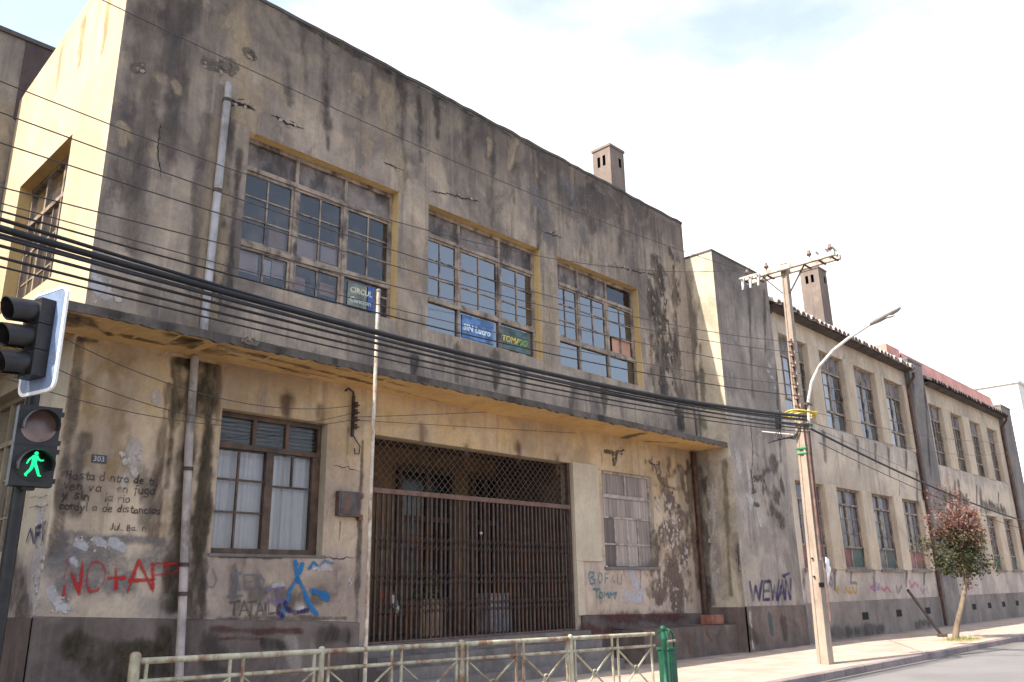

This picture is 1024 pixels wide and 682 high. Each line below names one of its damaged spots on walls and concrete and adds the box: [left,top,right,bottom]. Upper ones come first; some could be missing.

spalling [201,47,257,76]
water stain [228,38,250,141]
crack [231,99,304,129]
crack [154,122,162,176]
crack [432,190,479,202]
water stain [191,153,241,321]
water stain [228,347,373,384]
peeling [118,439,144,488]
water stain [48,313,217,619]
peeling [70,536,126,566]
peeling [647,459,692,614]